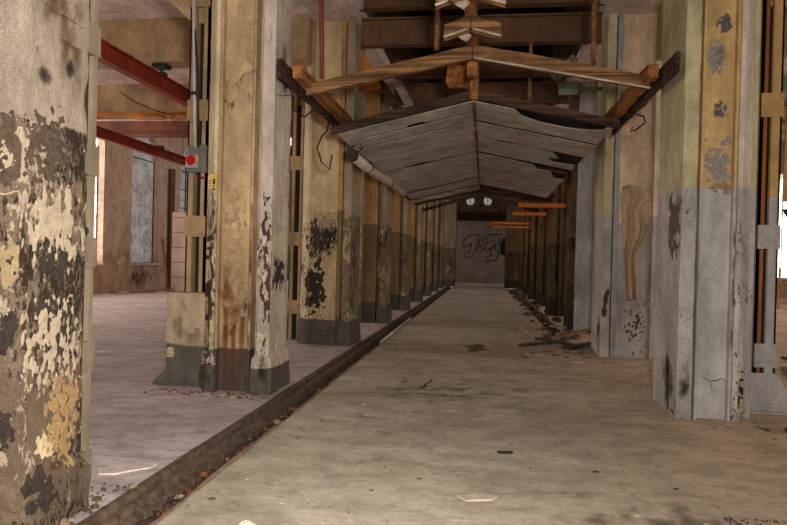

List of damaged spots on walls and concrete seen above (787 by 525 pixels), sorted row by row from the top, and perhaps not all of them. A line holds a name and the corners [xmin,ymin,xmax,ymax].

peeling [707,13,732,75]
peeling [714,100,727,118]
peeling [704,135,732,196]
peeling [259,194,286,323]
peeling [304,216,327,317]
spalling [668,192,681,260]
peeling [0,104,86,516]
peeling [624,304,645,341]